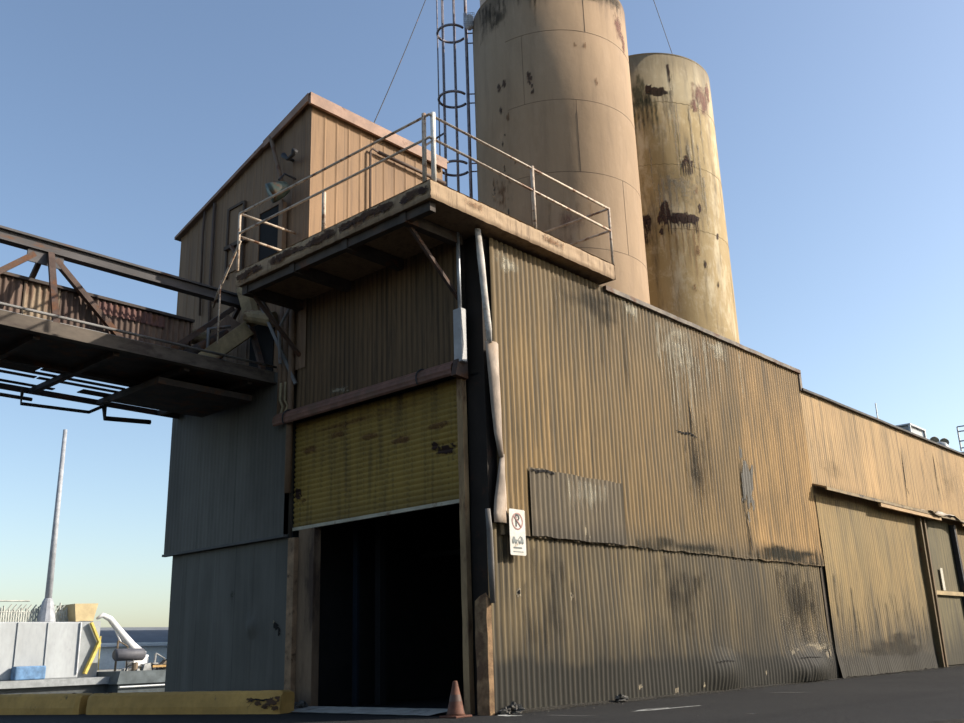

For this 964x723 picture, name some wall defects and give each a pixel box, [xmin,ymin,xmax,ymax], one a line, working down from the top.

rust [645,64,670,112]
rust [642,200,699,244]
rust [432,442,456,454]
peeling [739,446,755,522]
water stain [758,545,823,565]